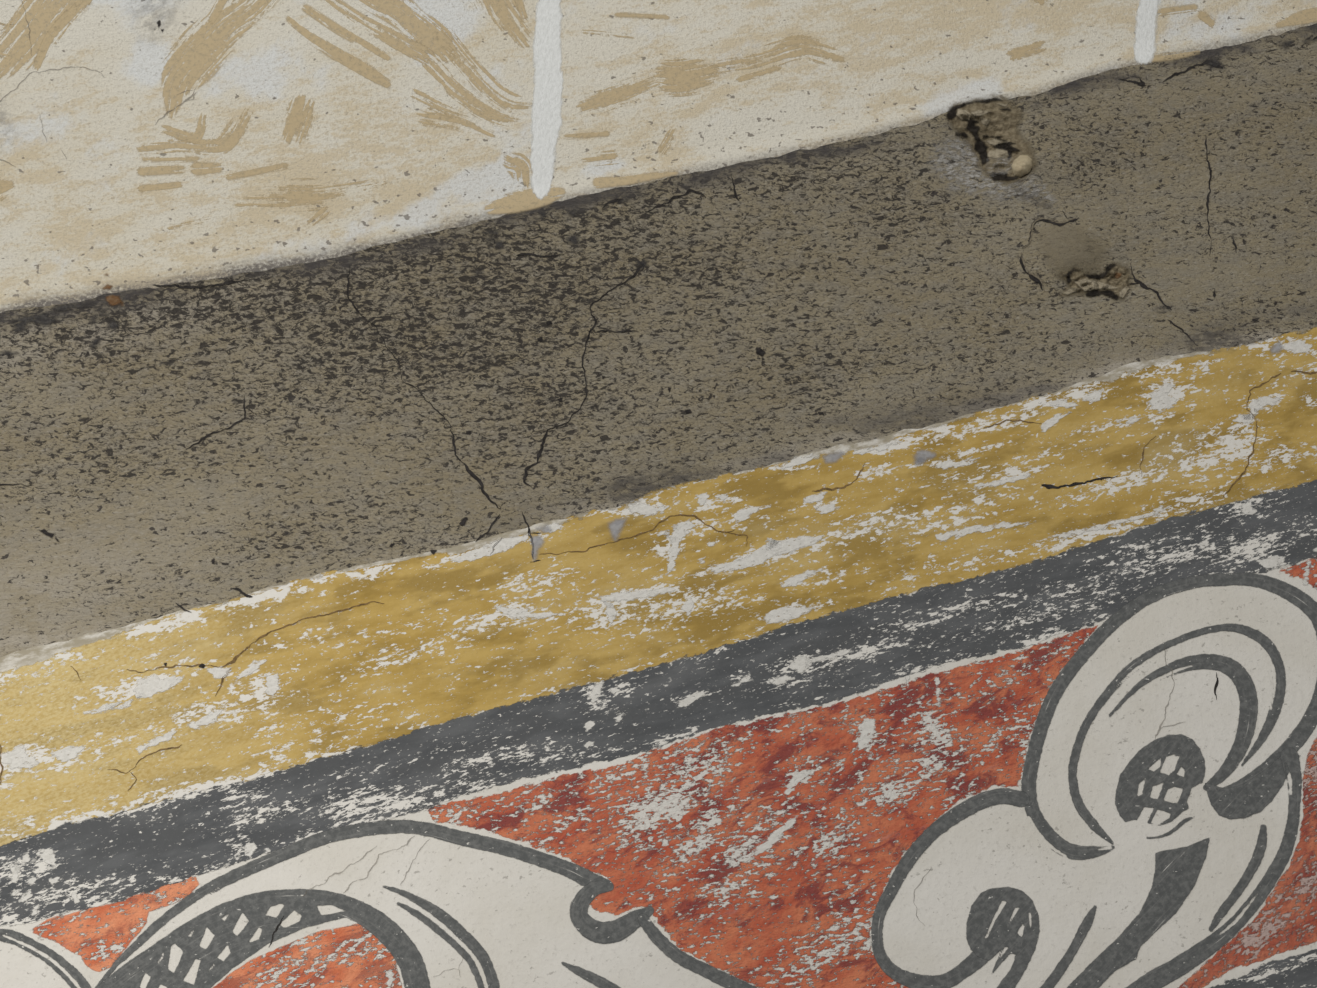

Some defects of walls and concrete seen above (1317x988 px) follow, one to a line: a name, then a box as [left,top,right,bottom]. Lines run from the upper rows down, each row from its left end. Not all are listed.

spalling [946,98,1036,183]
crack [1019,213,1078,291]
crack [1128,263,1198,346]
crack [346,262,748,562]
crack [1041,436,1156,489]
crack [1223,370,1317,497]
peeling [451,523,562,562]
peeling [600,479,695,624]
peeling [695,535,823,575]
crack [126,601,384,696]
peeling [769,649,858,687]
peeling [743,815,798,862]